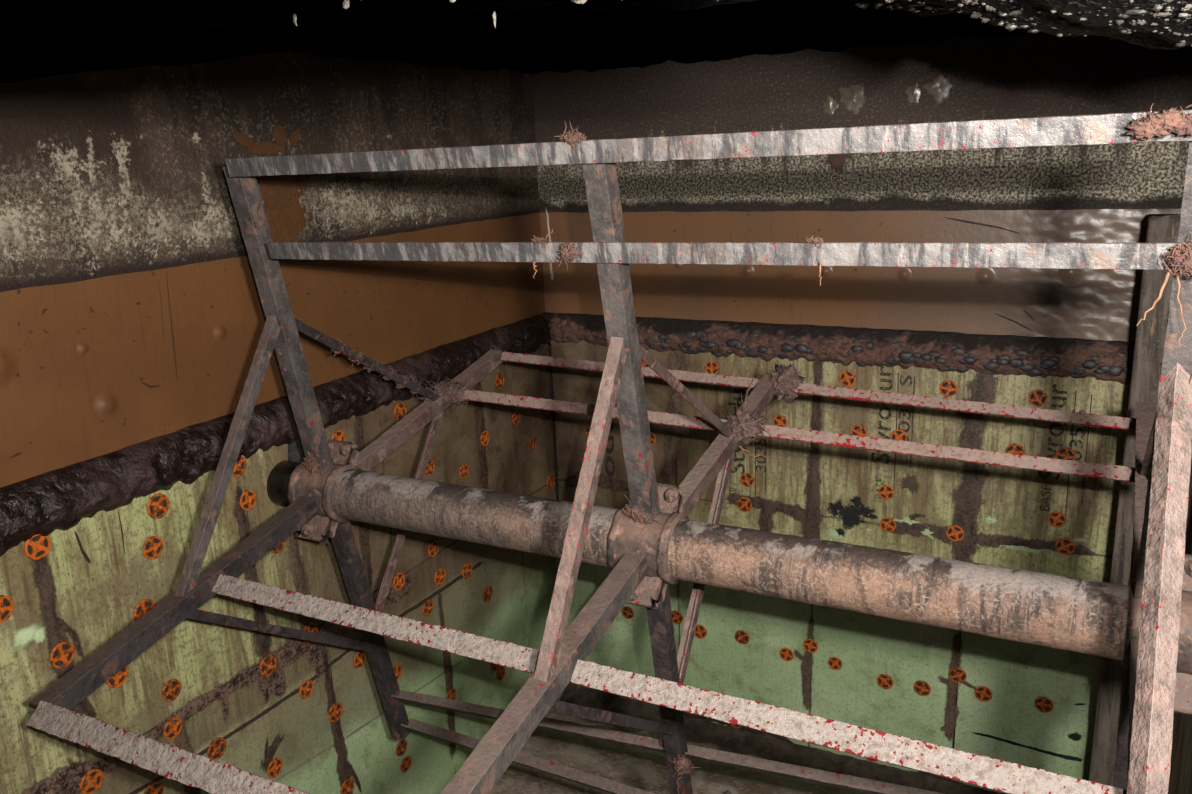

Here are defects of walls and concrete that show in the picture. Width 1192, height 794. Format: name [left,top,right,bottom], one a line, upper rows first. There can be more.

leakage [0,133,239,274]
peeling [826,526,845,541]
peeling [894,516,934,540]
peeling [998,544,1045,555]